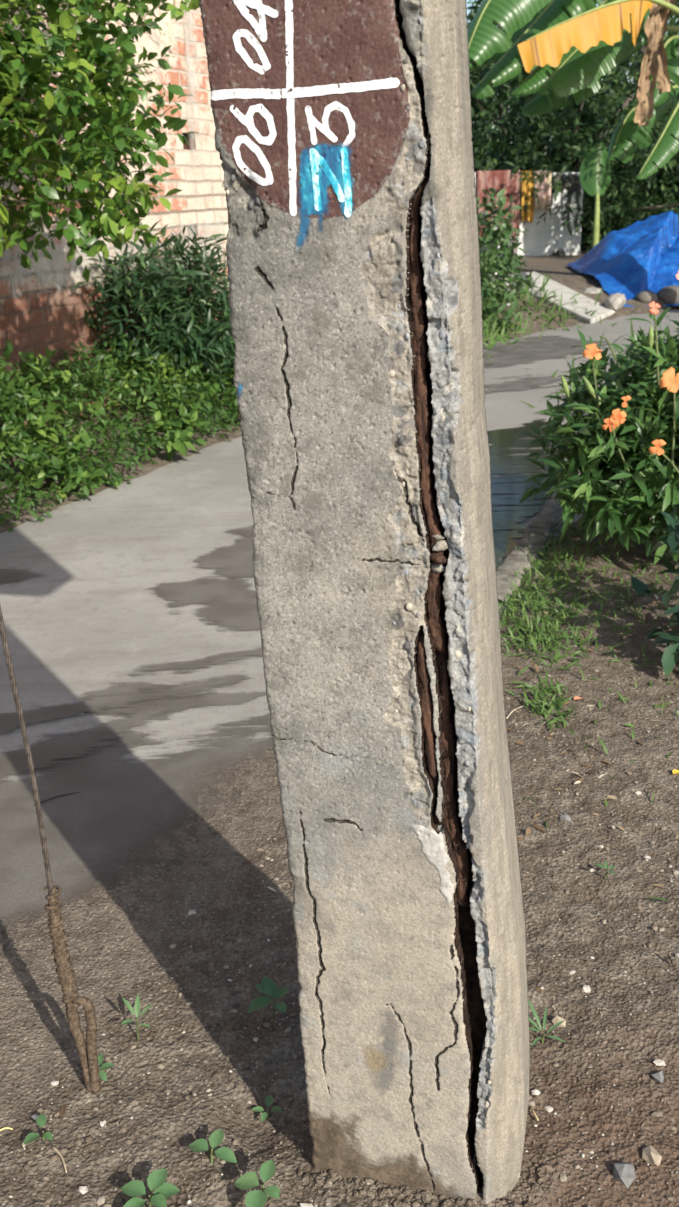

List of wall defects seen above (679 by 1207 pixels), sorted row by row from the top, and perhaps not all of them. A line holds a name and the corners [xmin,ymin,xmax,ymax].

crack [257,209,269,232]
crack [254,267,298,510]
leakage [0,567,44,583]
leakage [148,525,261,631]
crack [363,0,487,1194]
spalling [361,0,497,1130]
leakage [0,646,273,954]
crack [300,811,362,1095]